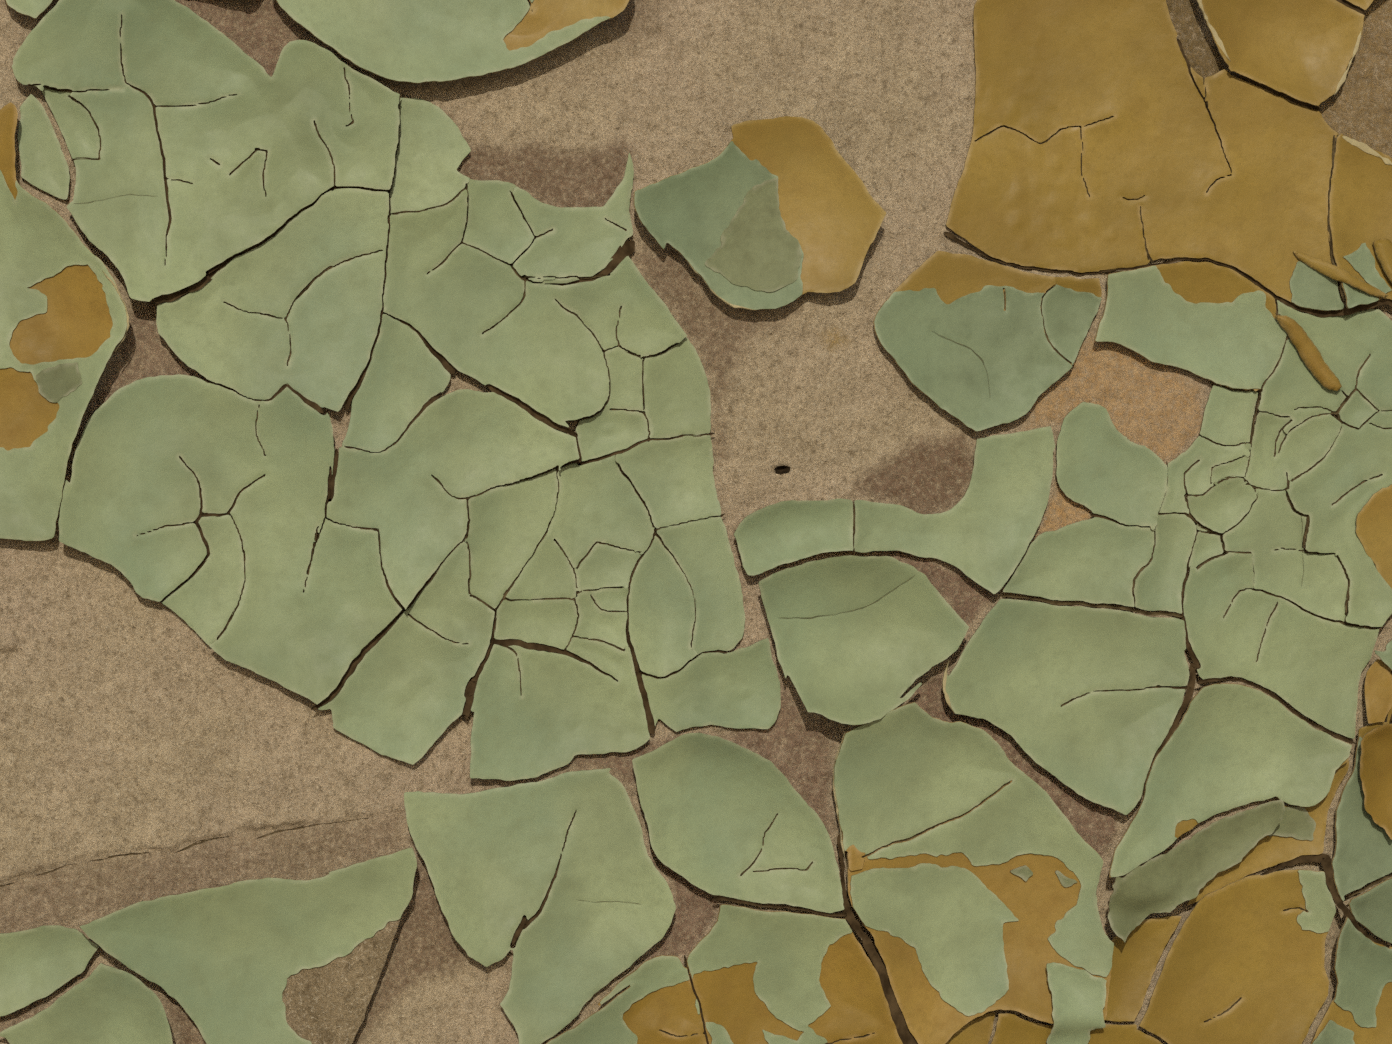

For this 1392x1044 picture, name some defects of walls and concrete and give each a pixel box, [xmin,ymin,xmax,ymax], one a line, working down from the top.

crack [29,15,725,735]
peeling [0,0,903,1044]
peeling [734,0,1392,1044]
crack [943,38,1392,805]
crack [1260,853,1392,948]
crack [1336,0,1365,14]